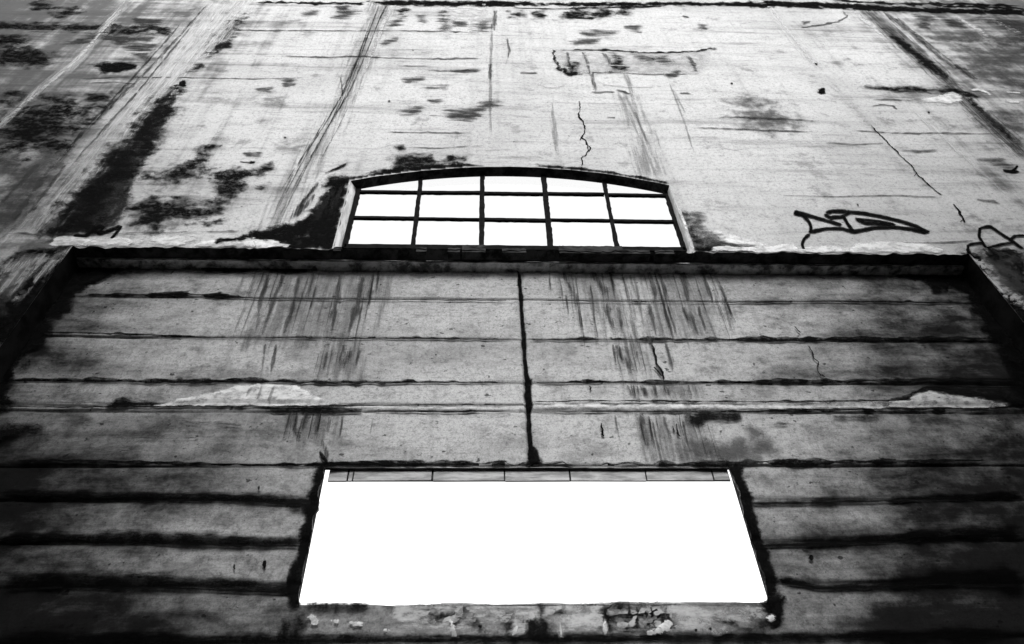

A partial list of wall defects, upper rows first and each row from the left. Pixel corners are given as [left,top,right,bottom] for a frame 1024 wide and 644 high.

leakage [0,0,274,347]
crack [578,89,629,166]
crack [786,99,996,243]
leakage [0,267,1024,644]
spalling [647,620,673,635]